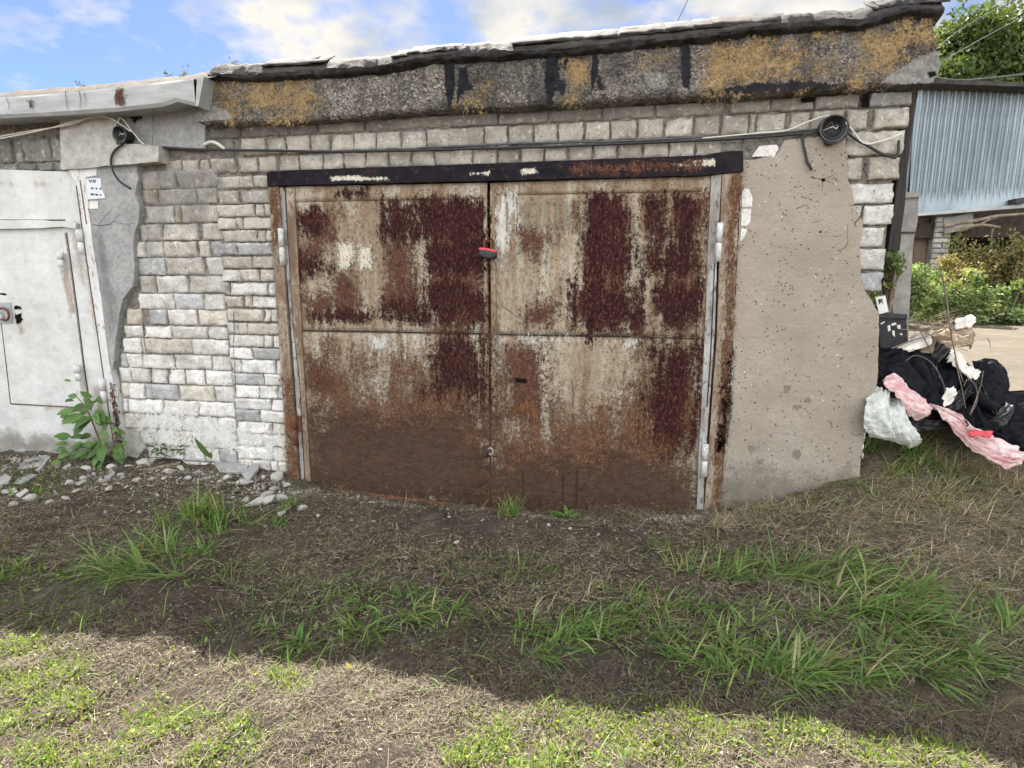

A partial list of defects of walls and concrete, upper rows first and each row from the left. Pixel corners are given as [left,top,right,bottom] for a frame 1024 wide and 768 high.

corrosion [114,87,126,106]
leakage [456,66,472,103]
leakage [553,59,568,96]
corrosion [566,156,707,178]
flaking render [752,145,779,157]
flaking render [740,189,753,241]
corrosion [712,172,744,508]
corrosion [279,376,302,480]